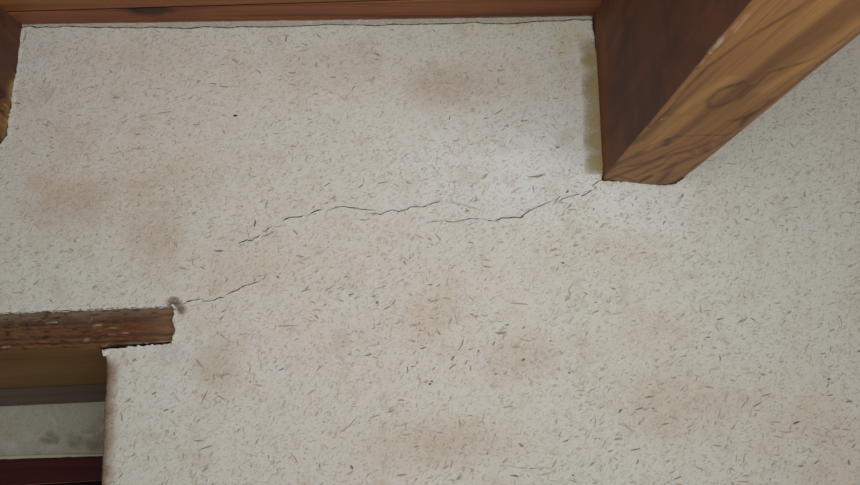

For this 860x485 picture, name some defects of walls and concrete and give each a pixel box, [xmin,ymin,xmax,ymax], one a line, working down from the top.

crack [238,180,602,245]
crack [184,275,265,306]